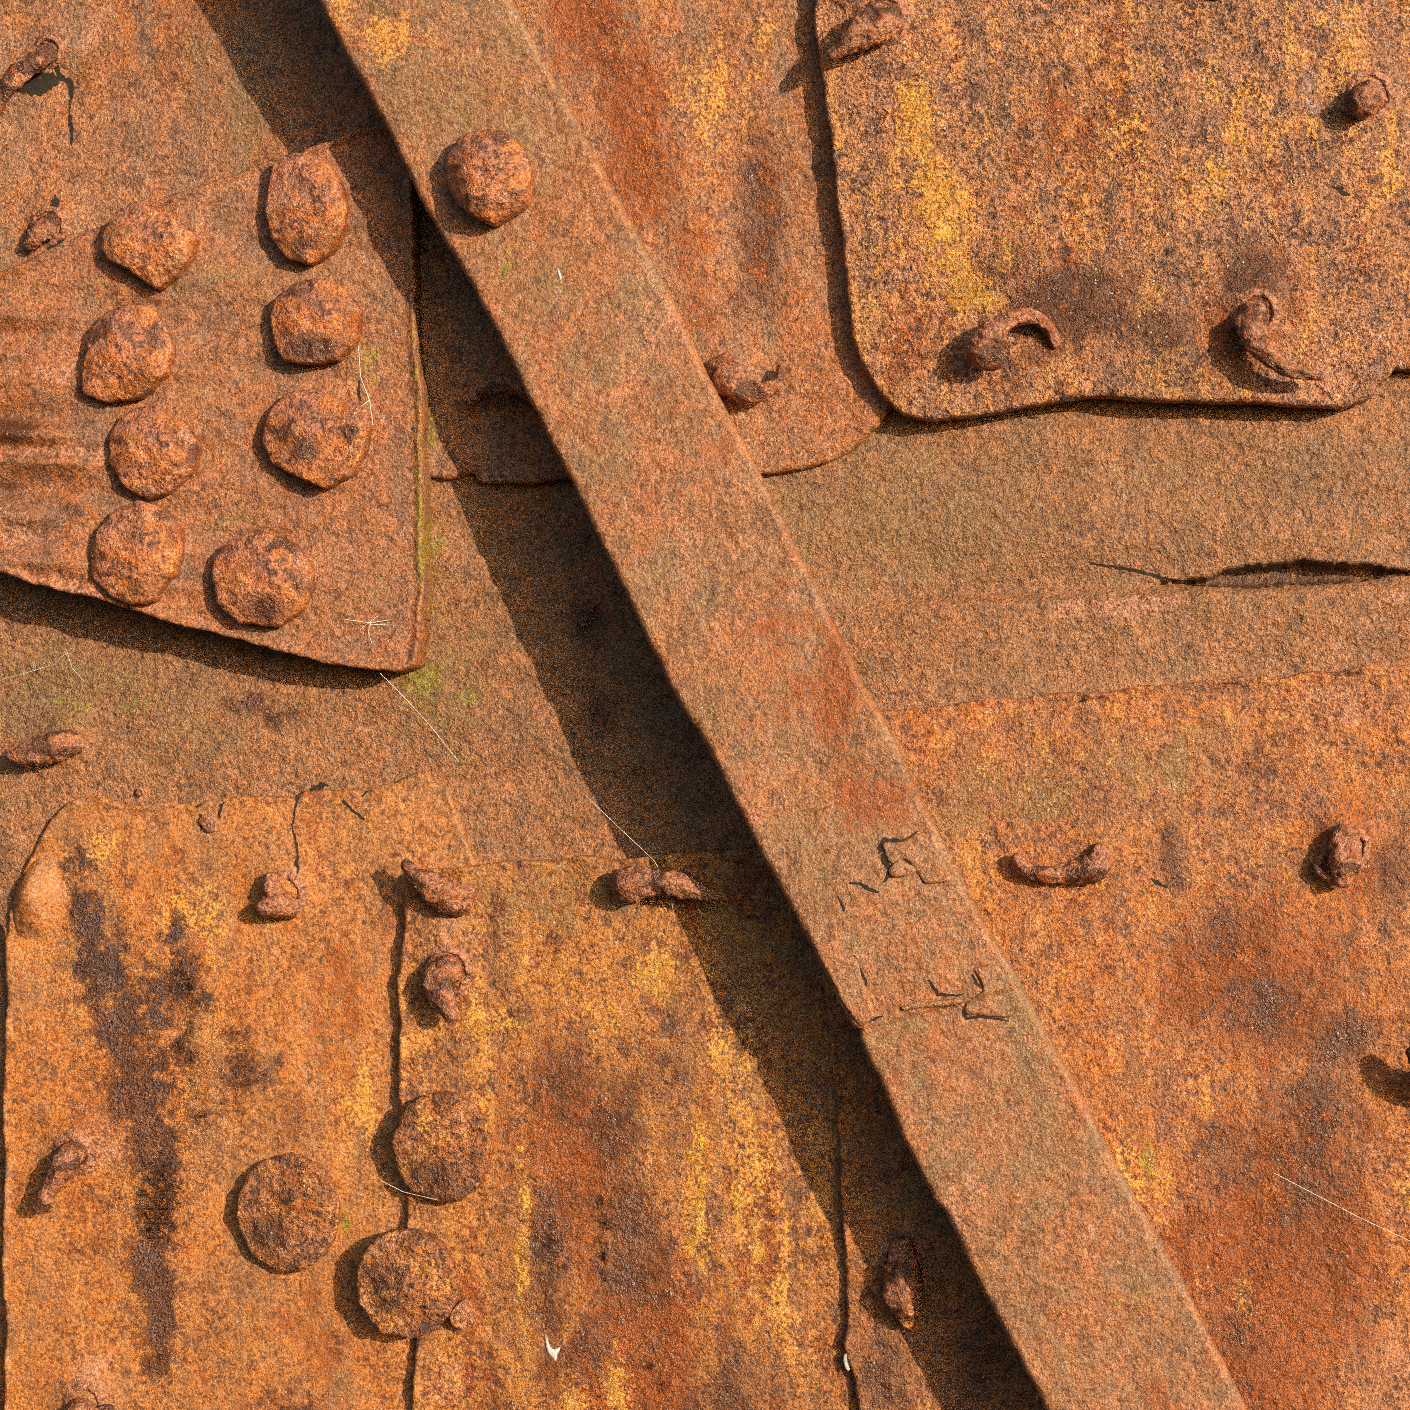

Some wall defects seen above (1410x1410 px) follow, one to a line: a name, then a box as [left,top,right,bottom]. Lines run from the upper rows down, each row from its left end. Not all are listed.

corrosion [899,78,1007,312]
corrosion [995,238,1021,272]
peeling [882,834,952,884]
peeling [814,940,874,1026]
corrosion [1175,919,1275,1030]
corrosion [59,846,285,1377]
corrosion [449,1300,476,1330]
corrosion [514,1145,531,1216]
corrosion [514,1177,628,1410]
corrosion [649,1108,711,1286]
corrosion [726,1156,766,1299]
corrosion [1236,1096,1360,1295]